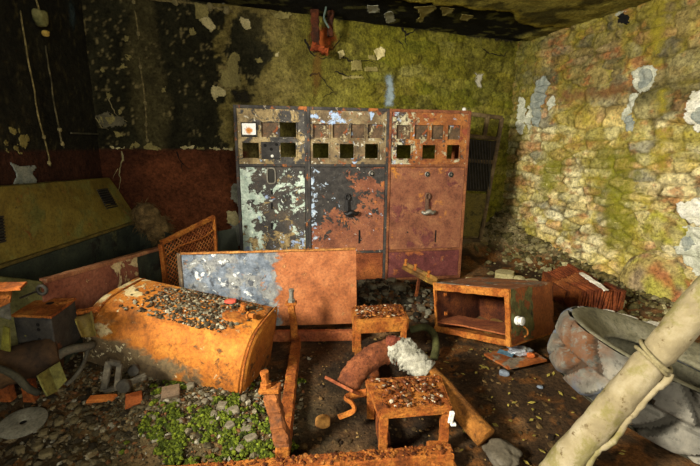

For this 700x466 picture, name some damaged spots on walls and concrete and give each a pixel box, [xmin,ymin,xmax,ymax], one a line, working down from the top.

peeling [189,2,216,35]
flaking render [271,11,292,20]
peeling [367,5,395,23]
peeling [414,6,454,23]
hole [615,11,630,25]
flaking render [95,92,127,137]
peeling [211,52,241,102]
leakage [231,87,255,104]
flaking render [338,47,386,80]
efflorescence [385,75,394,106]
peeling [530,76,556,127]
flaking render [10,163,37,184]